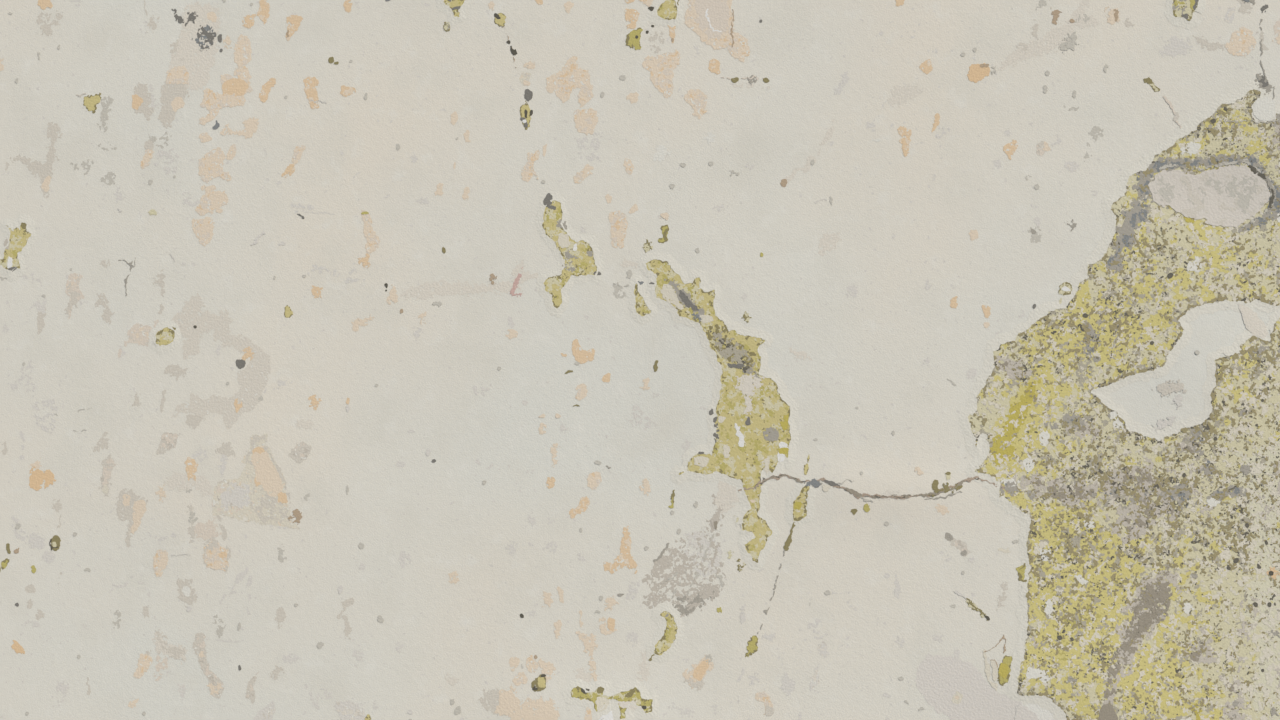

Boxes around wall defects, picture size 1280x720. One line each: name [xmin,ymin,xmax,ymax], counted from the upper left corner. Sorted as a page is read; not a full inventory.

peeling [0,213,38,281]
peeling [535,192,638,318]
peeling [626,225,817,572]
peeling [932,79,1280,720]
crack [738,453,1014,502]
crack [760,522,795,630]
peeling [494,596,659,720]